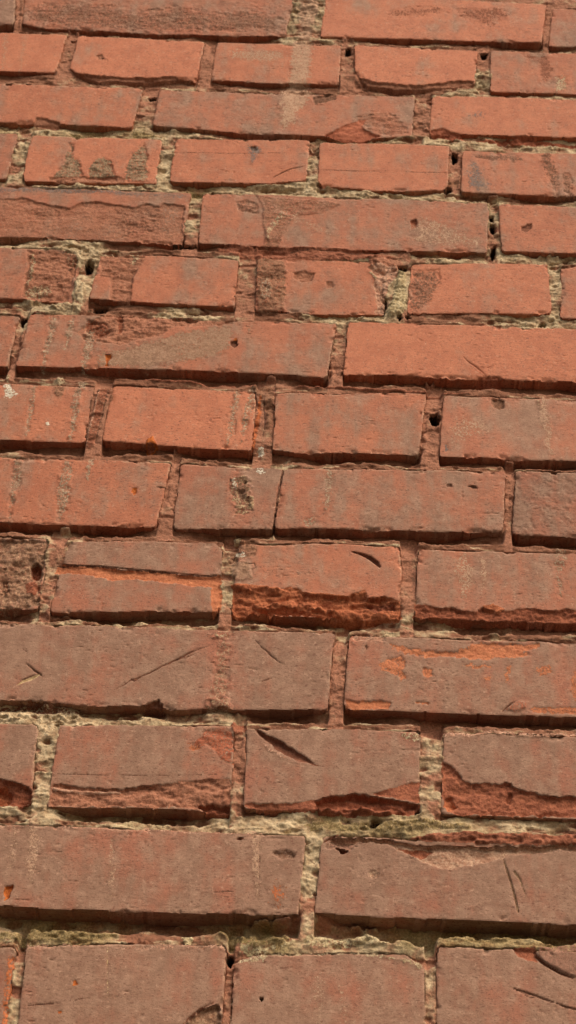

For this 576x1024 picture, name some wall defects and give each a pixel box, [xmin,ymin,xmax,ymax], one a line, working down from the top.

spalling [0,540,576,681]
crack [117,647,205,689]
spalling [0,779,33,809]
peeling [49,779,232,820]
spalling [245,782,420,818]
spalling [441,762,576,818]